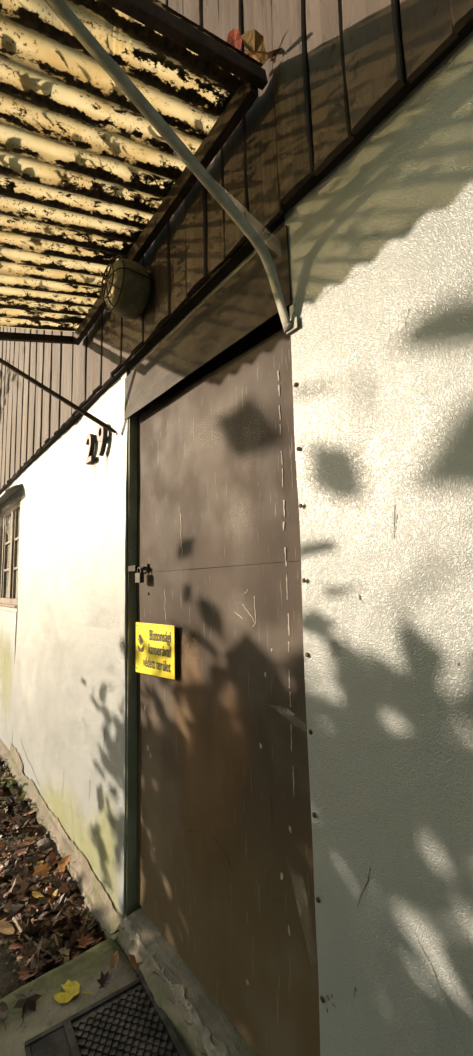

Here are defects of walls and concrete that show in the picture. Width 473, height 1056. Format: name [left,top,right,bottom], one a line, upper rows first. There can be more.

spalling [10,744,226,1056]